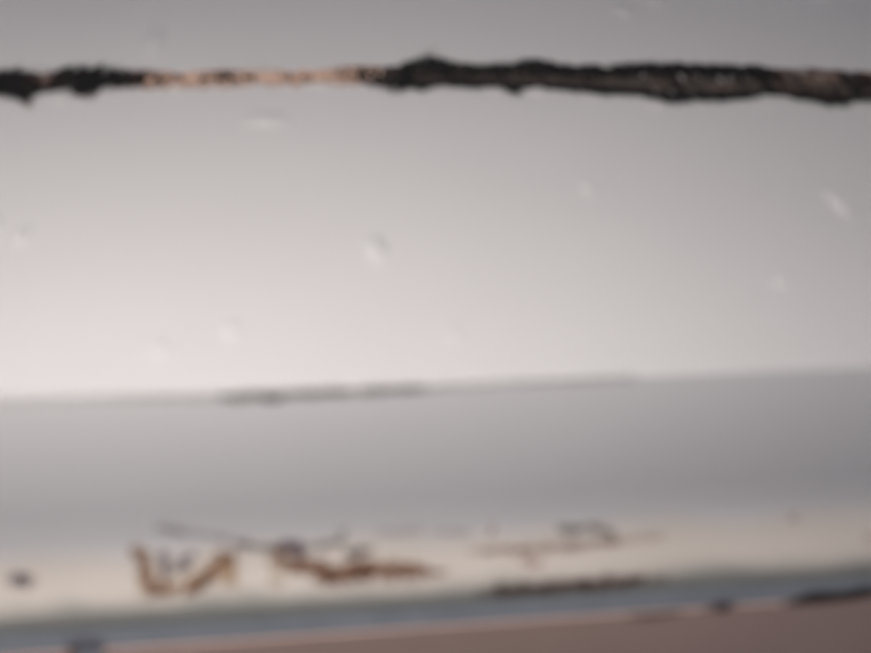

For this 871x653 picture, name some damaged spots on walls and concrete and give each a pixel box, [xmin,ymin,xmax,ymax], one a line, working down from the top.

crack [0,48,871,109]